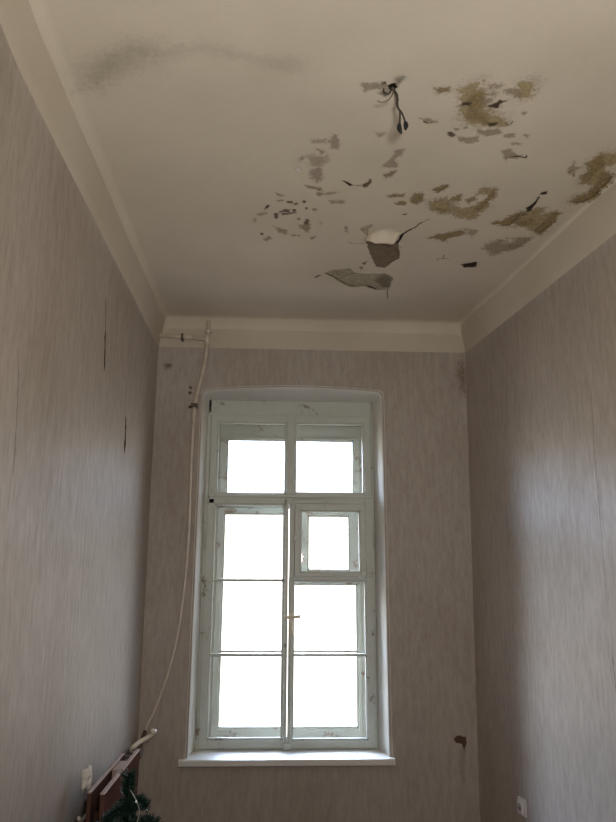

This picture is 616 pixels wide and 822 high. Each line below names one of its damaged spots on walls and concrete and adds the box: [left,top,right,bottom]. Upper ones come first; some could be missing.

flaking render [296,135,339,196]
peeling [447,127,514,143]
peeling [260,193,316,241]
peeling [315,222,422,298]